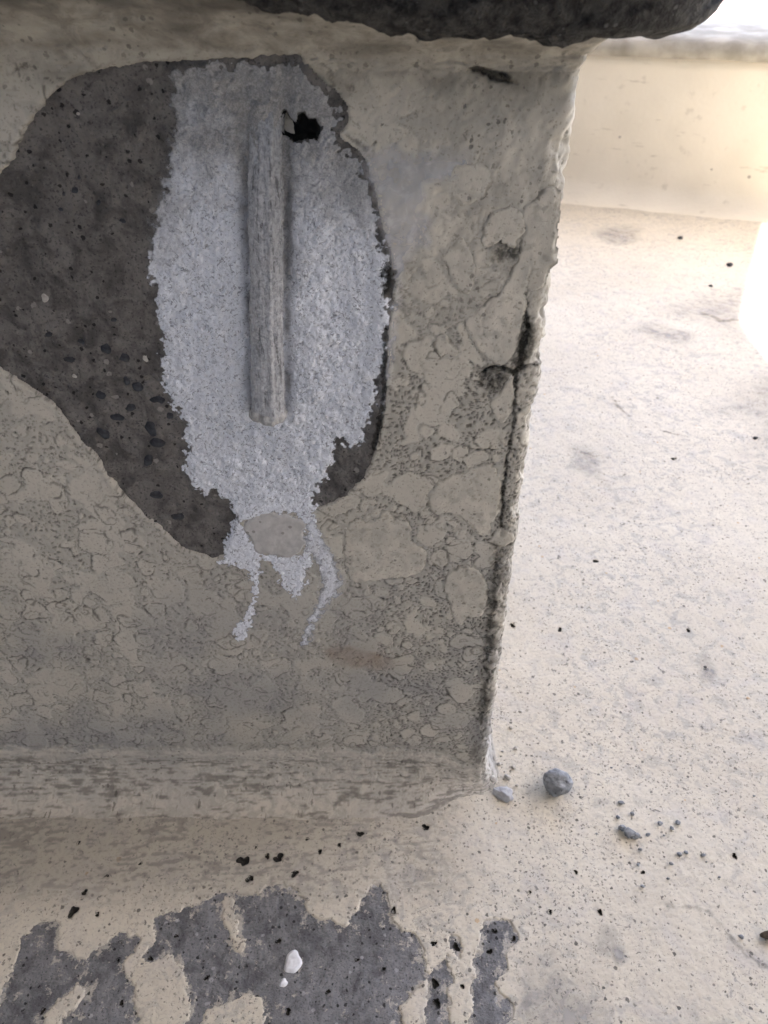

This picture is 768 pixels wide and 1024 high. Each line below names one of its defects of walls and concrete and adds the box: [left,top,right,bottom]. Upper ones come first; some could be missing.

spalling [0,54,396,558]
leakage [147,59,417,646]
crack [482,293,539,527]
peeling [0,846,519,1024]